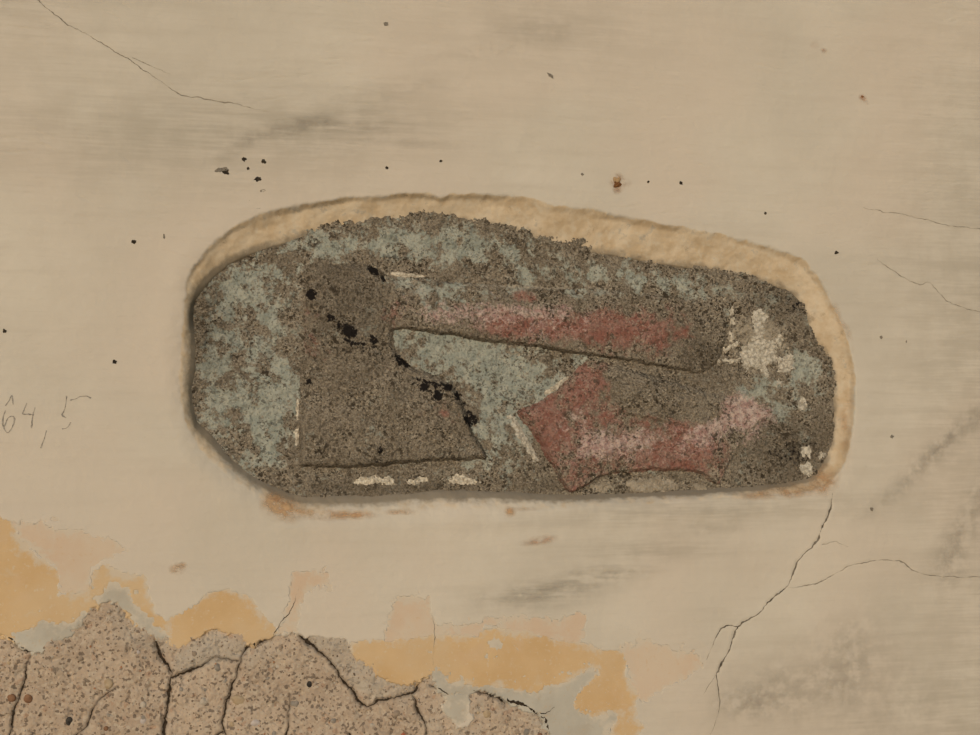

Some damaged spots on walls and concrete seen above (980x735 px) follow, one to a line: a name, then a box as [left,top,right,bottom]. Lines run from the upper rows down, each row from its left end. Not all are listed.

crack [38,0,253,109]
crack [877,259,980,312]
peeling [354,475,428,485]
peeling [442,473,481,485]
peeling [590,481,613,493]
peeling [626,475,680,493]
spalling [0,517,645,735]
crack [705,493,978,731]
crack [8,637,35,735]
crack [155,589,449,735]
crack [473,690,554,733]